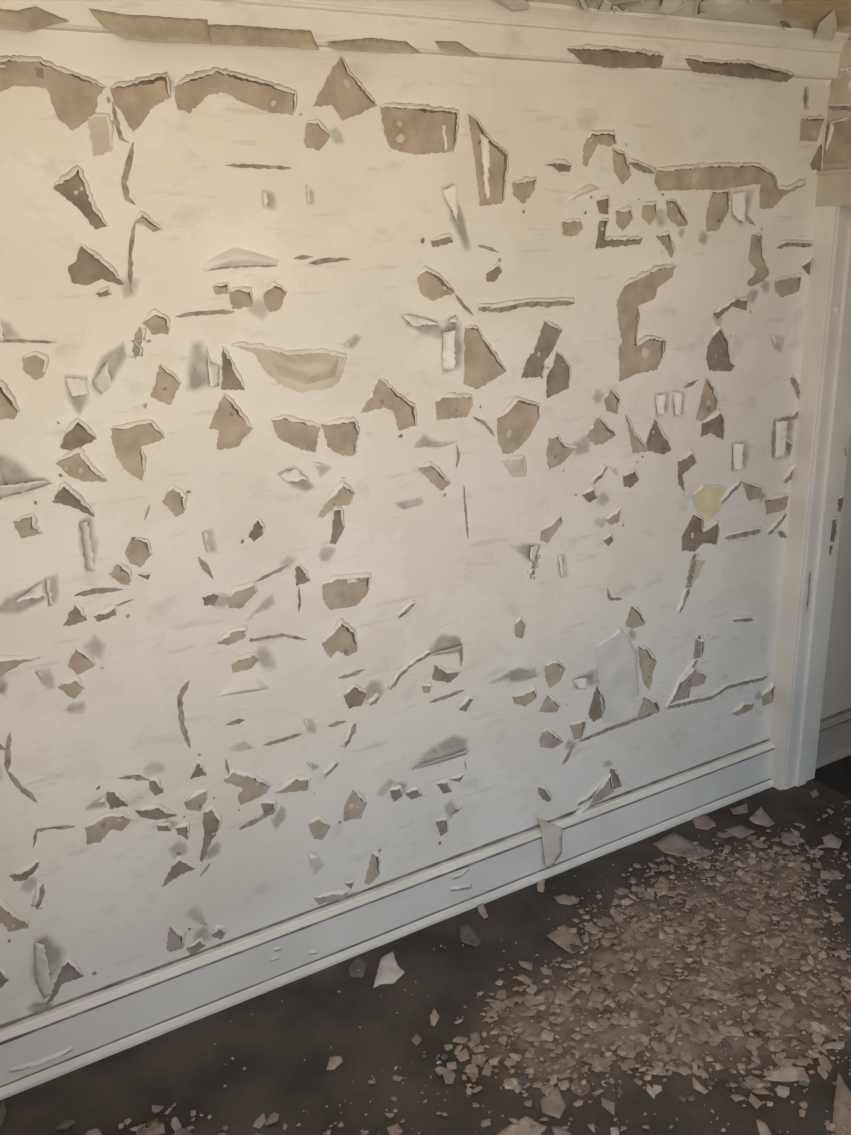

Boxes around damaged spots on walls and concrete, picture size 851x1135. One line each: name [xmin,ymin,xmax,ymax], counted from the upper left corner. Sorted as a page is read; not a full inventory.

peeling [0,6,537,214]
peeling [567,43,665,69]
peeling [53,165,108,229]
peeling [0,308,171,571]
peeling [68,244,126,297]
peeling [111,345,253,481]
peeling [271,377,417,466]
peeling [402,265,507,420]
peeling [497,320,572,478]
peeling [545,66,851,555]
peeling [202,563,372,673]
peeling [84,753,222,887]